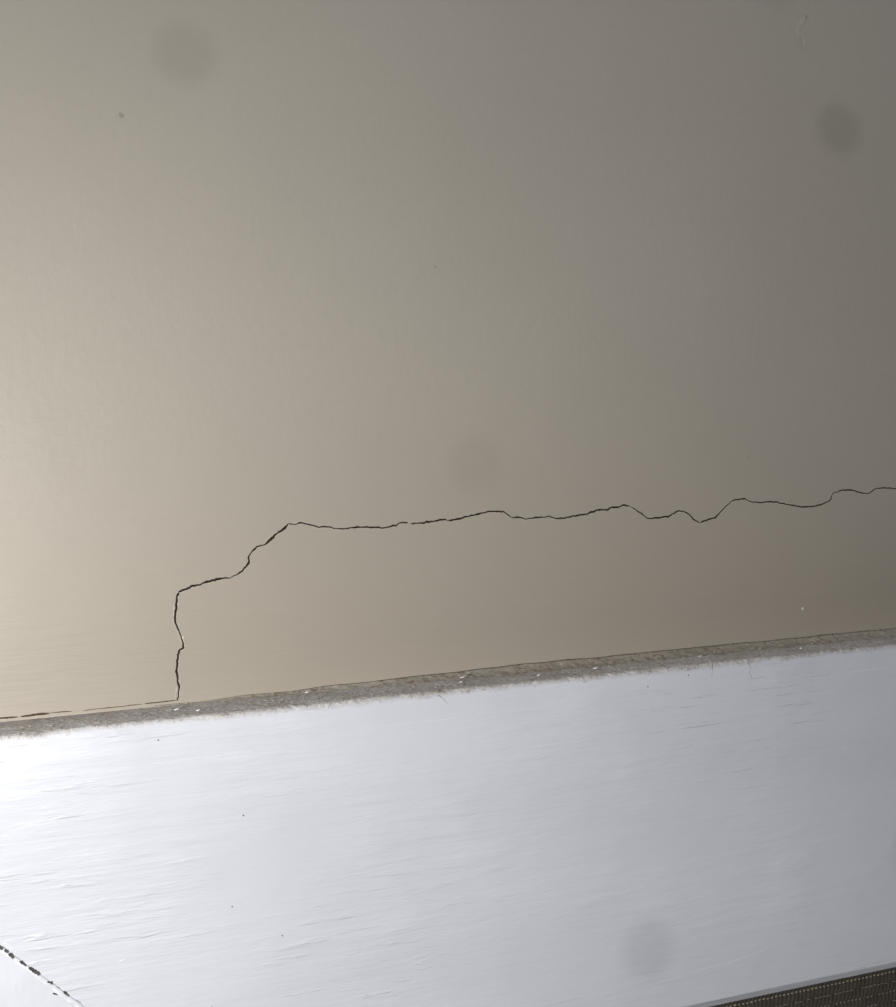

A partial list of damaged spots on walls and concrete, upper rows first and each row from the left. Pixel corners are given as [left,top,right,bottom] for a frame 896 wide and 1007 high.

crack [173,486,896,701]
crack [0,942,84,1007]